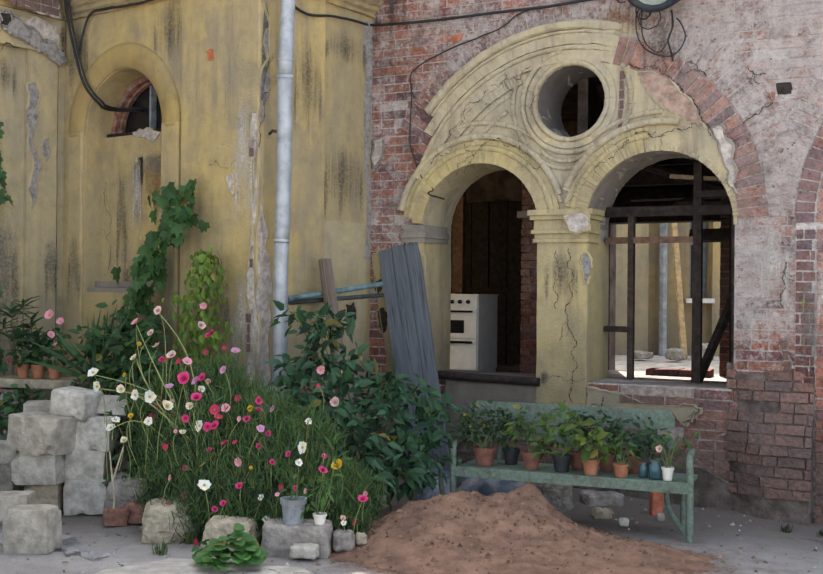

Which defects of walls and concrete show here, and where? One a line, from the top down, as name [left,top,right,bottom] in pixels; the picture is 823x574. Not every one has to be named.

spalling [0,0,68,66]
spalling [25,80,52,210]
spalling [243,0,273,393]
crack [431,66,540,174]
spalling [563,210,591,235]
spalling [579,251,593,285]
spalling [613,65,741,195]
crack [743,68,773,124]
crack [544,248,604,407]